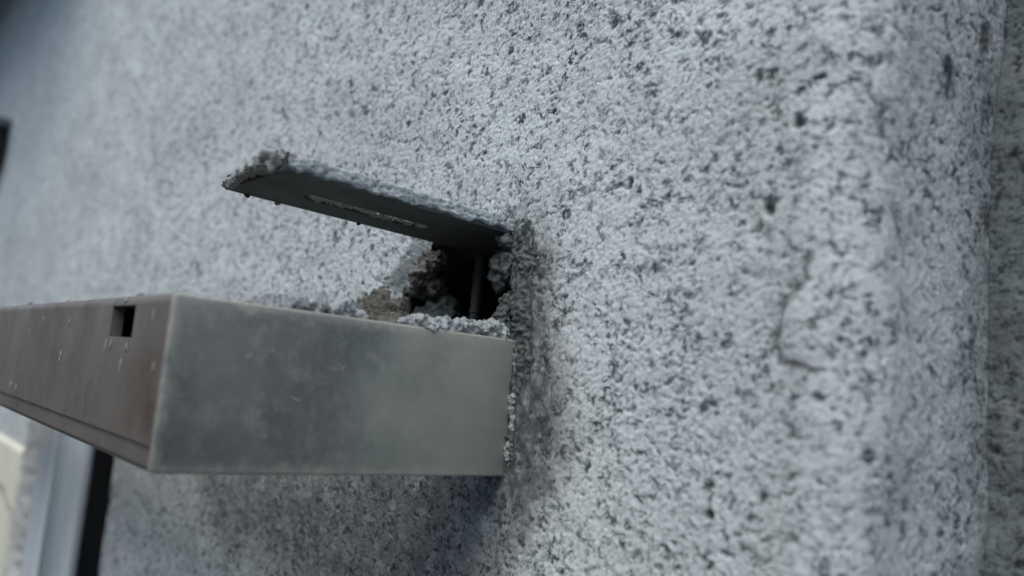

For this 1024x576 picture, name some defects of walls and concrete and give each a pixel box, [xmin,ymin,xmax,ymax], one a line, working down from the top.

spalling [352,215,541,466]